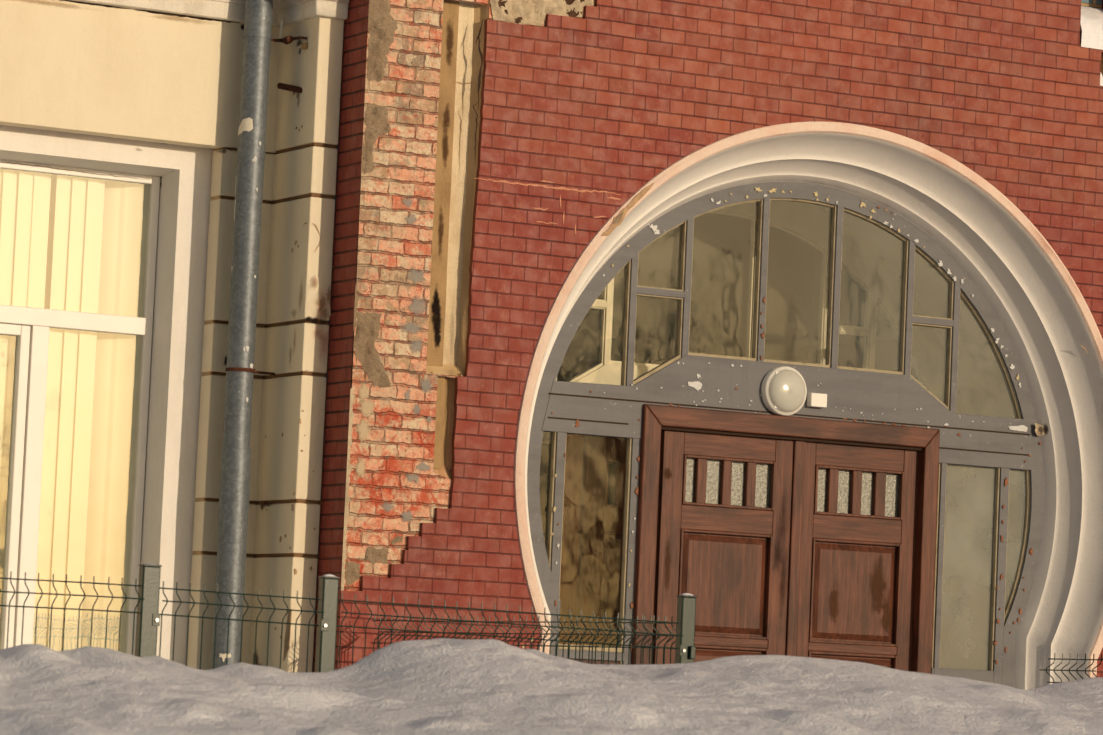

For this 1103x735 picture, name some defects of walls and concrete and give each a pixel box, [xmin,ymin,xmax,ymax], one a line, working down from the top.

crack [62,0,237,23]
crack [457,20,622,235]
spalling [339,0,595,625]
peeling [687,374,706,406]